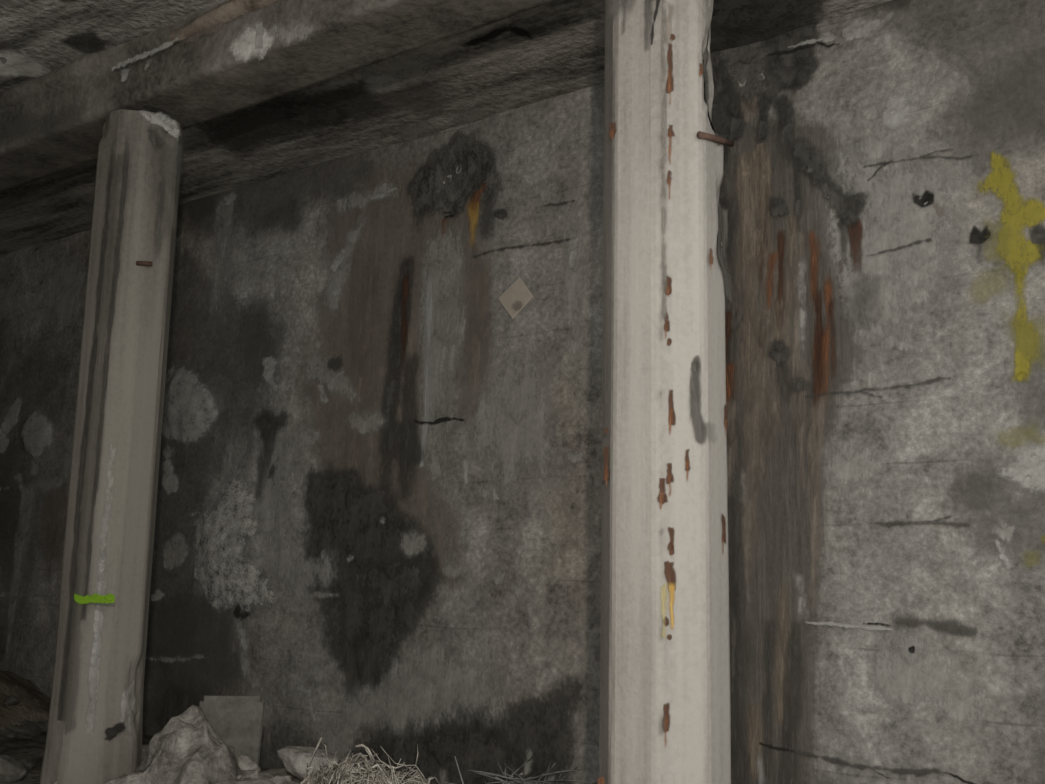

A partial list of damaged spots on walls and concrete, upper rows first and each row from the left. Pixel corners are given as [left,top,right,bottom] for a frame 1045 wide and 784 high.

crack [864,149,979,181]
damp [690,356,706,443]
rust [725,216,796,586]
damp [710,0,986,784]
crack [808,377,950,398]
damp [291,160,585,784]
rust [658,463,674,508]
crack [879,516,970,527]
rust [662,527,676,640]
damp [236,620,273,731]
rust [662,703,670,743]
crack [760,742,974,784]